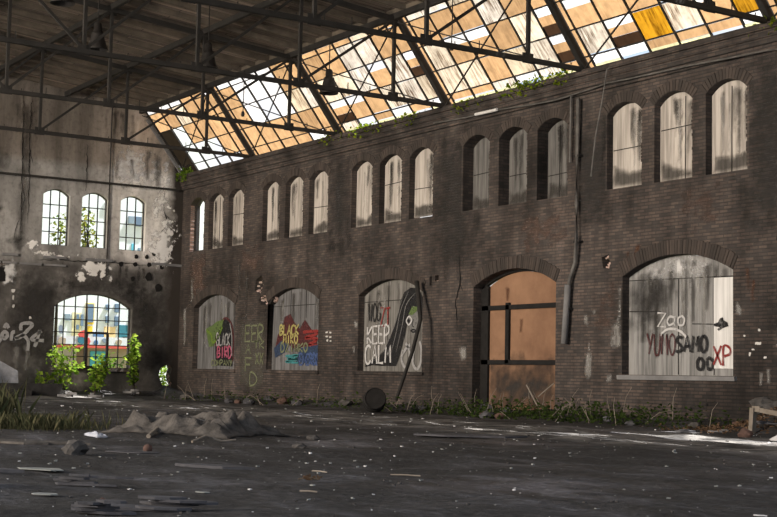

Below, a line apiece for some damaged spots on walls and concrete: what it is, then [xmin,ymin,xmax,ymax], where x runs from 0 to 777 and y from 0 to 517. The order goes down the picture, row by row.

peeling [27,240,78,260]
peeling [76,190,180,292]
peeling [4,264,15,308]